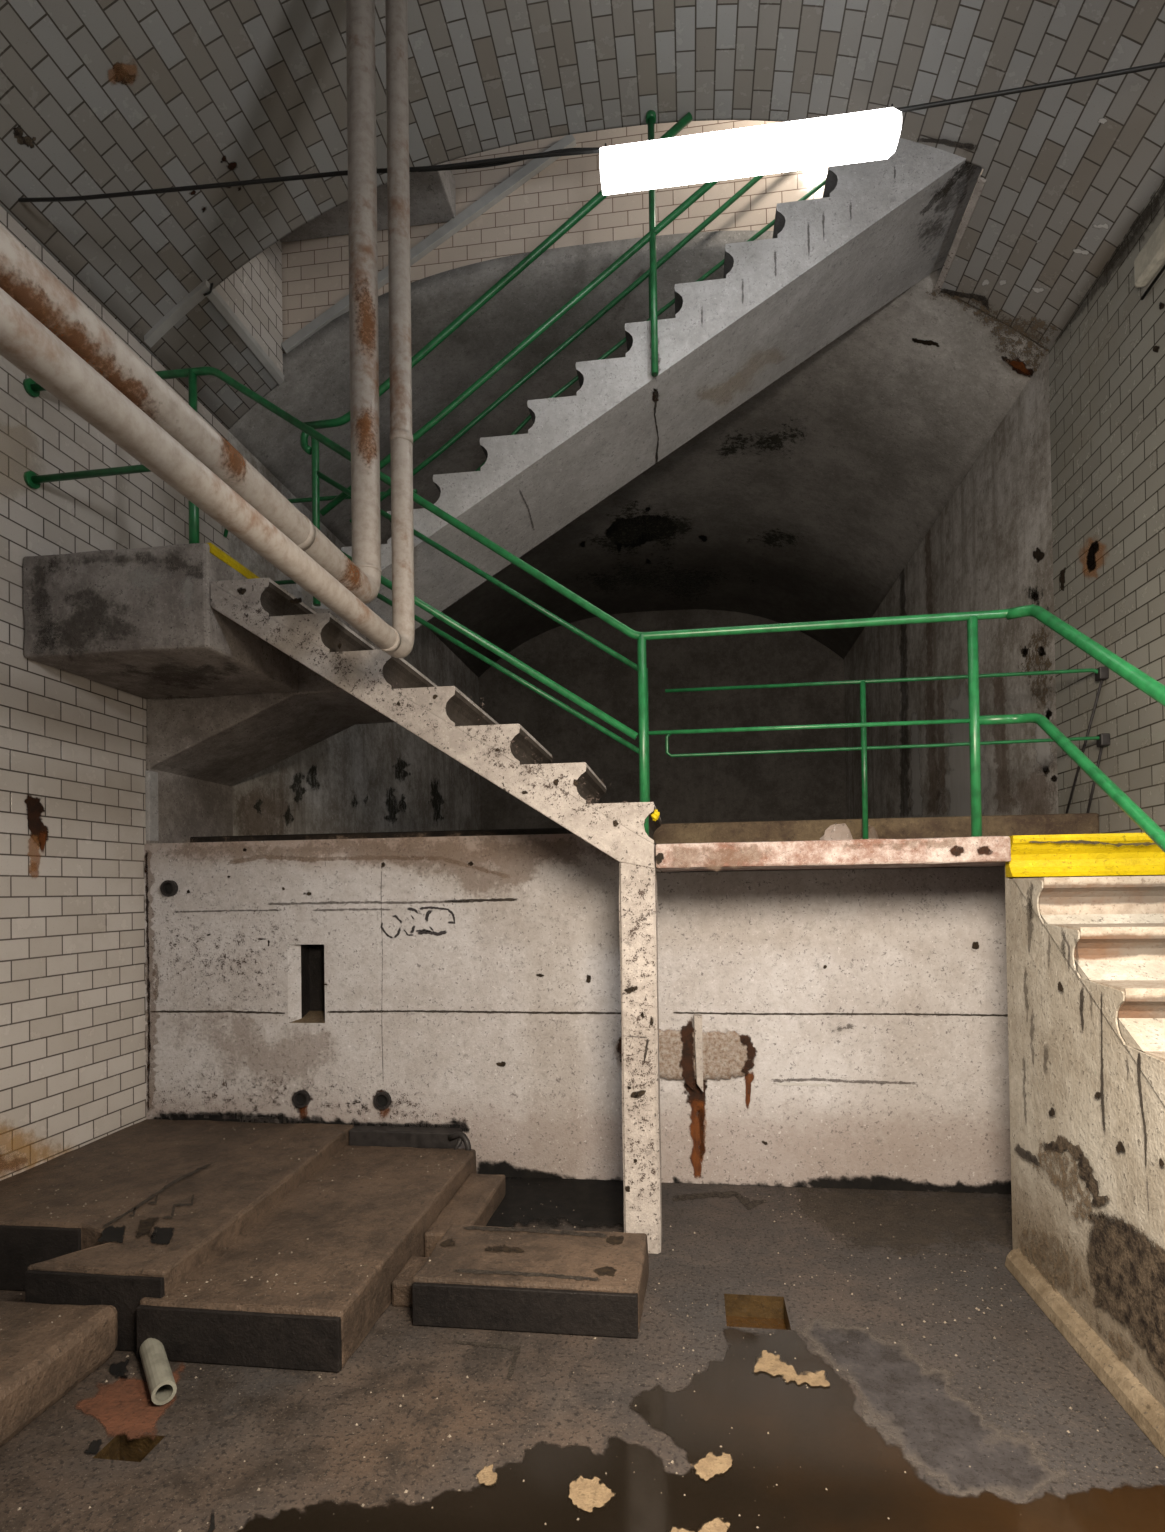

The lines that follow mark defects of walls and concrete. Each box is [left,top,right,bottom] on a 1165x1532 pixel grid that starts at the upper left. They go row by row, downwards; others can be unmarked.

crack [651,373,659,464]
corrosion [1082,539,1104,576]
corrosion [24,794,49,877]
leakage [283,763,320,826]
leakage [352,758,411,825]
leakage [430,778,444,824]
corrosion [659,1014,757,1178]
spalling [1015,1135,1165,1379]